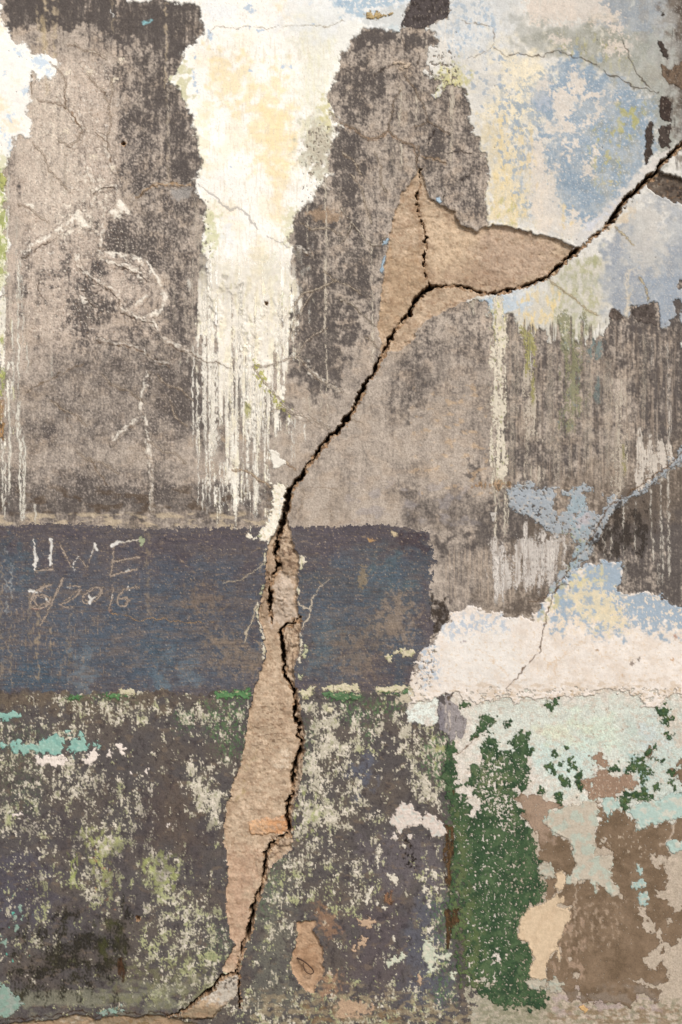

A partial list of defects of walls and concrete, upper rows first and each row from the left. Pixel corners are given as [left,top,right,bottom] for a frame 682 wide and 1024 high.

peeling [166,0,682,359]
water stain [0,261,37,521]
crack [96,75,682,1020]
water stain [488,296,574,602]
water stain [588,378,673,579]
spalling [0,482,362,1024]
peeling [375,445,682,1013]
water stain [8,899,134,1002]
peeling [351,886,388,952]